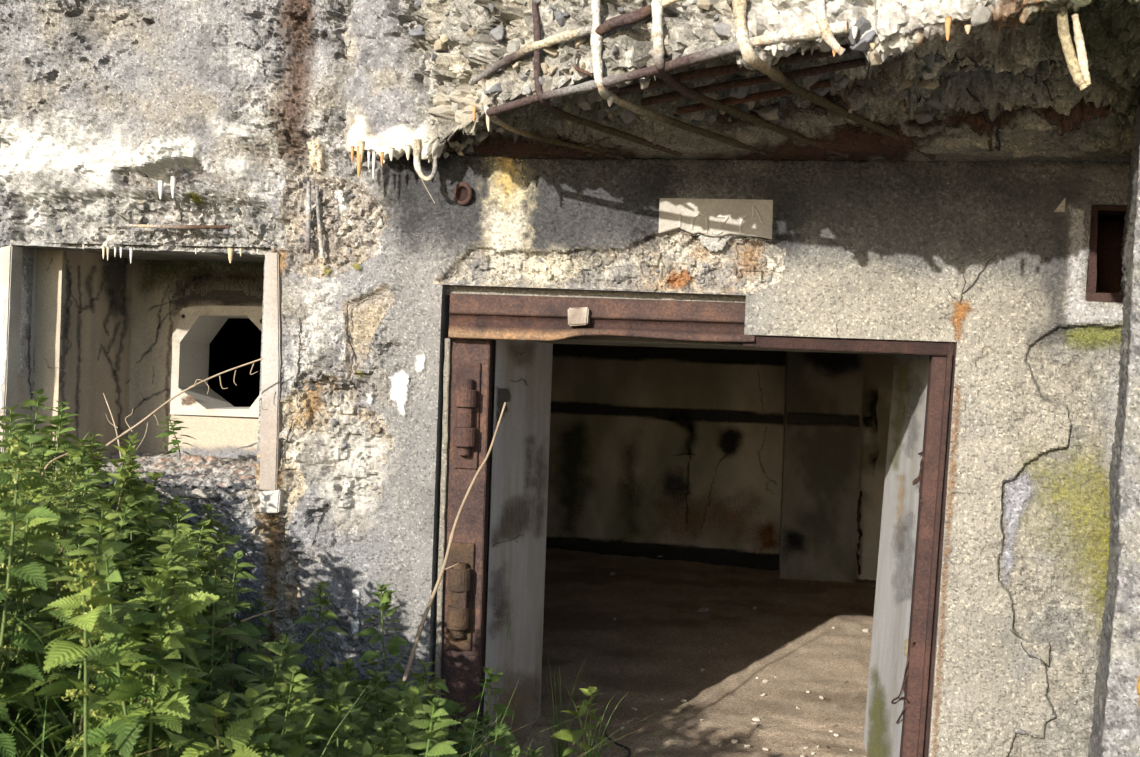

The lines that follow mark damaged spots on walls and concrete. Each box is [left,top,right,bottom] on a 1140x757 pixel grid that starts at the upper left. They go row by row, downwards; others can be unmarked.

corrosion [276,0,311,156]
spalling [409,0,936,181]
damp [738,0,980,70]
corrosion [705,78,1113,162]
spalling [1057,11,1091,91]
spalling [9,156,390,279]
damp [346,79,1123,342]
spalling [433,229,786,295]
corrosion [953,302,972,338]
crack [947,255,996,304]
damp [717,429,743,466]
corrosion [256,510,282,653]